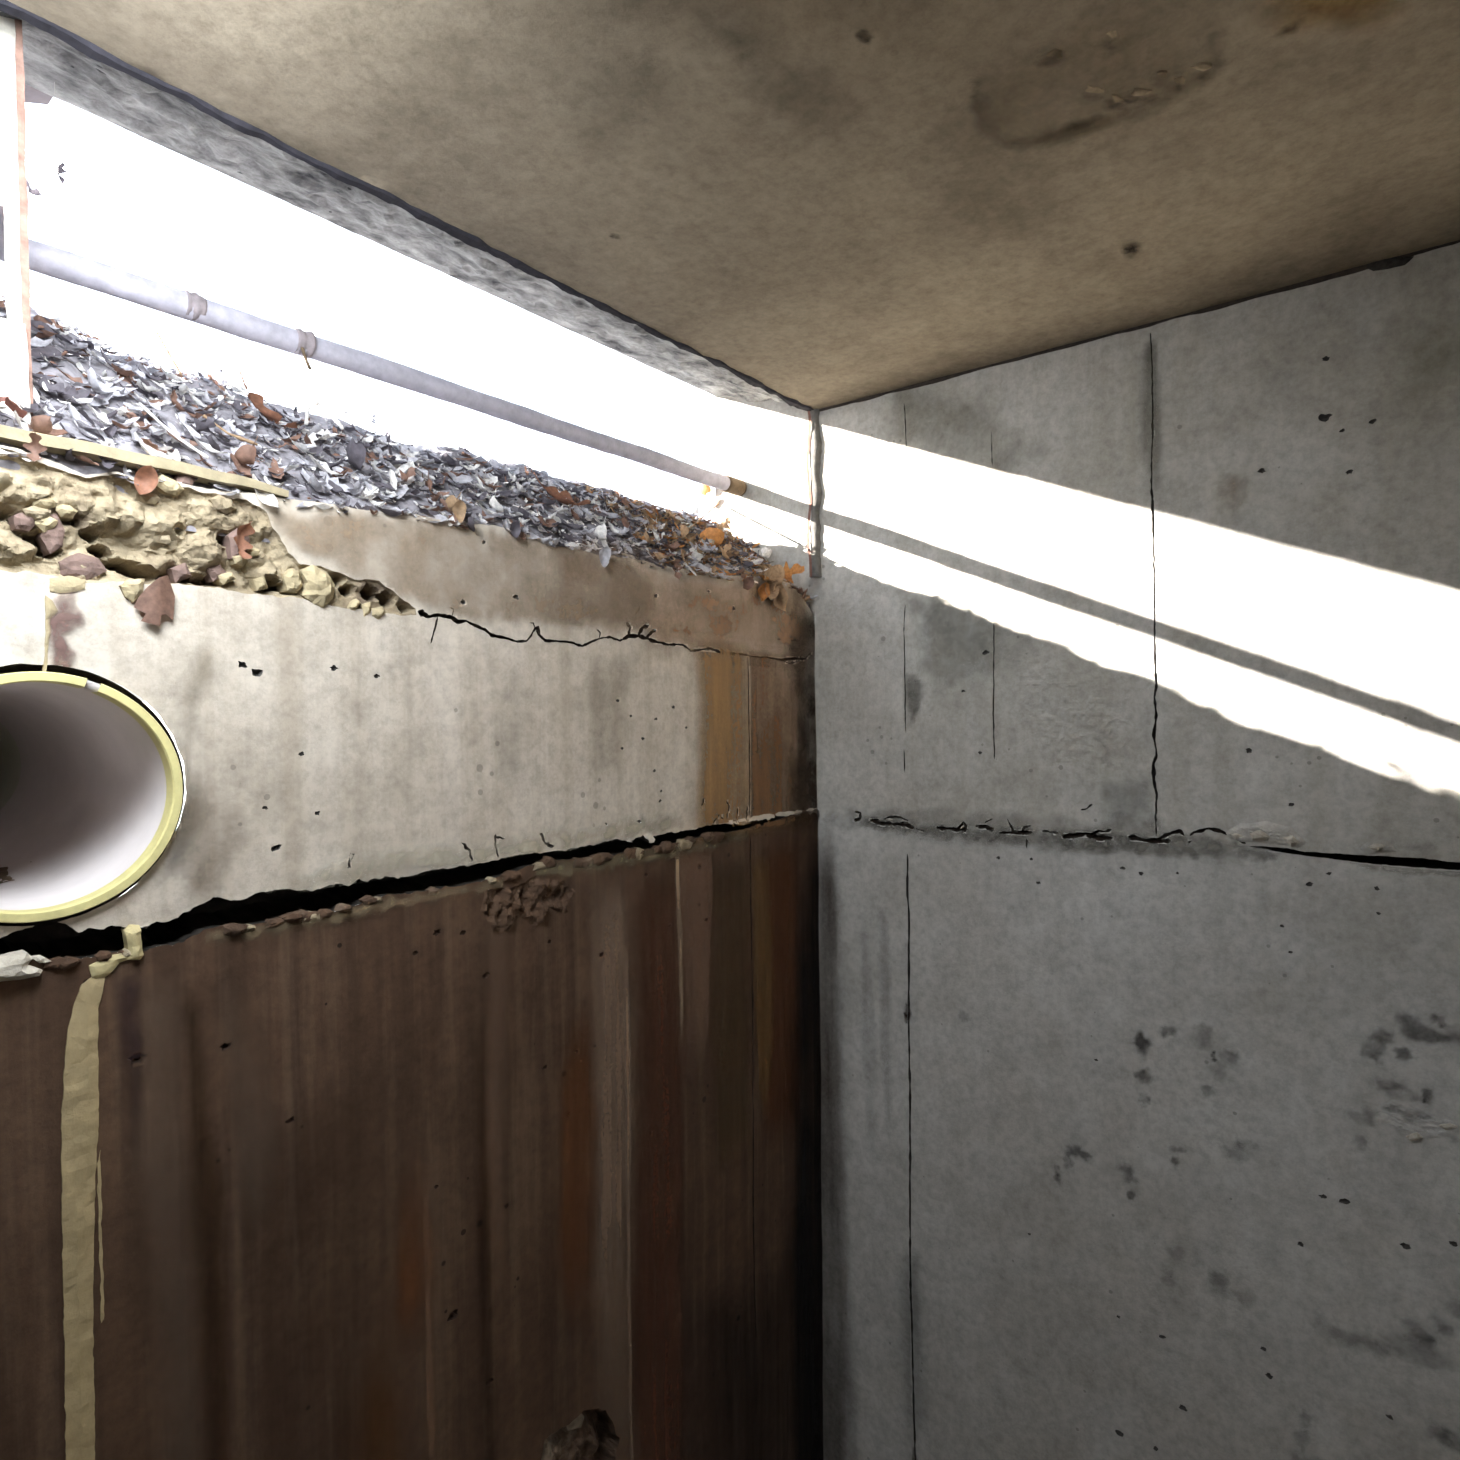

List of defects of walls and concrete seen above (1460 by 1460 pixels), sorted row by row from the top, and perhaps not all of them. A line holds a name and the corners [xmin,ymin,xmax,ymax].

spalling [0,447,416,672]
corrosion [615,584,809,830]
crack [0,607,810,1334]
crack [854,333,1460,1460]
spalling [541,1408,620,1460]